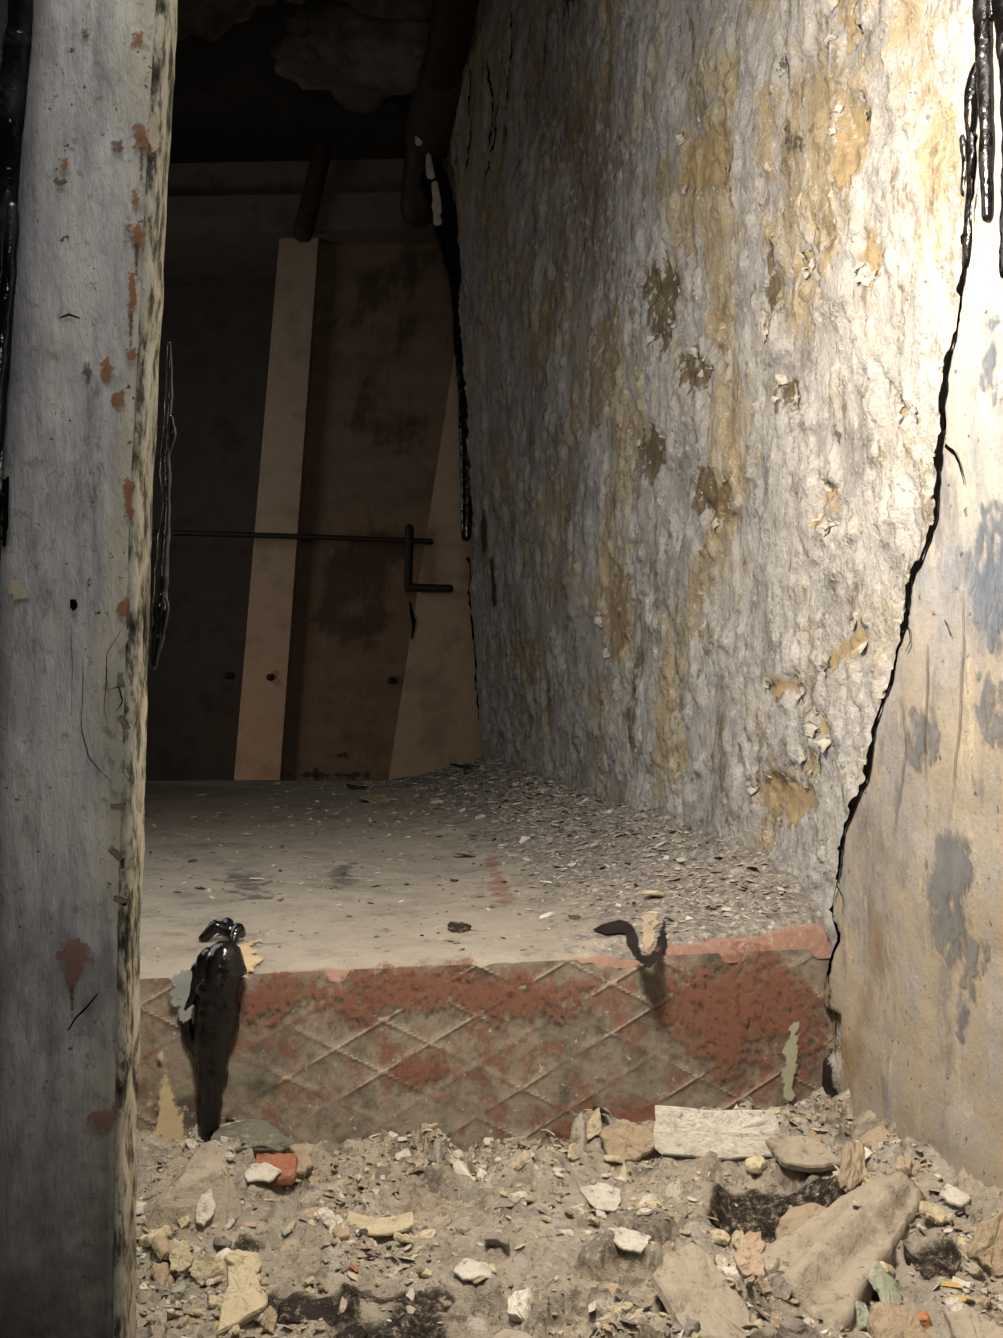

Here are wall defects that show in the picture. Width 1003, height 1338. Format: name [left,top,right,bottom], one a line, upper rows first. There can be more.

rust [53,157,68,186]
rust [111,123,151,205]
peeling [829,89,871,200]
rust [81,223,146,407]
peeling [640,259,714,396]
peeling [760,237,780,343]
peeling [771,373,800,413]
rust [121,477,135,519]
peeling [637,419,666,486]
peeling [691,462,734,530]
crack [825,91,978,989]
peeling [746,671,832,829]